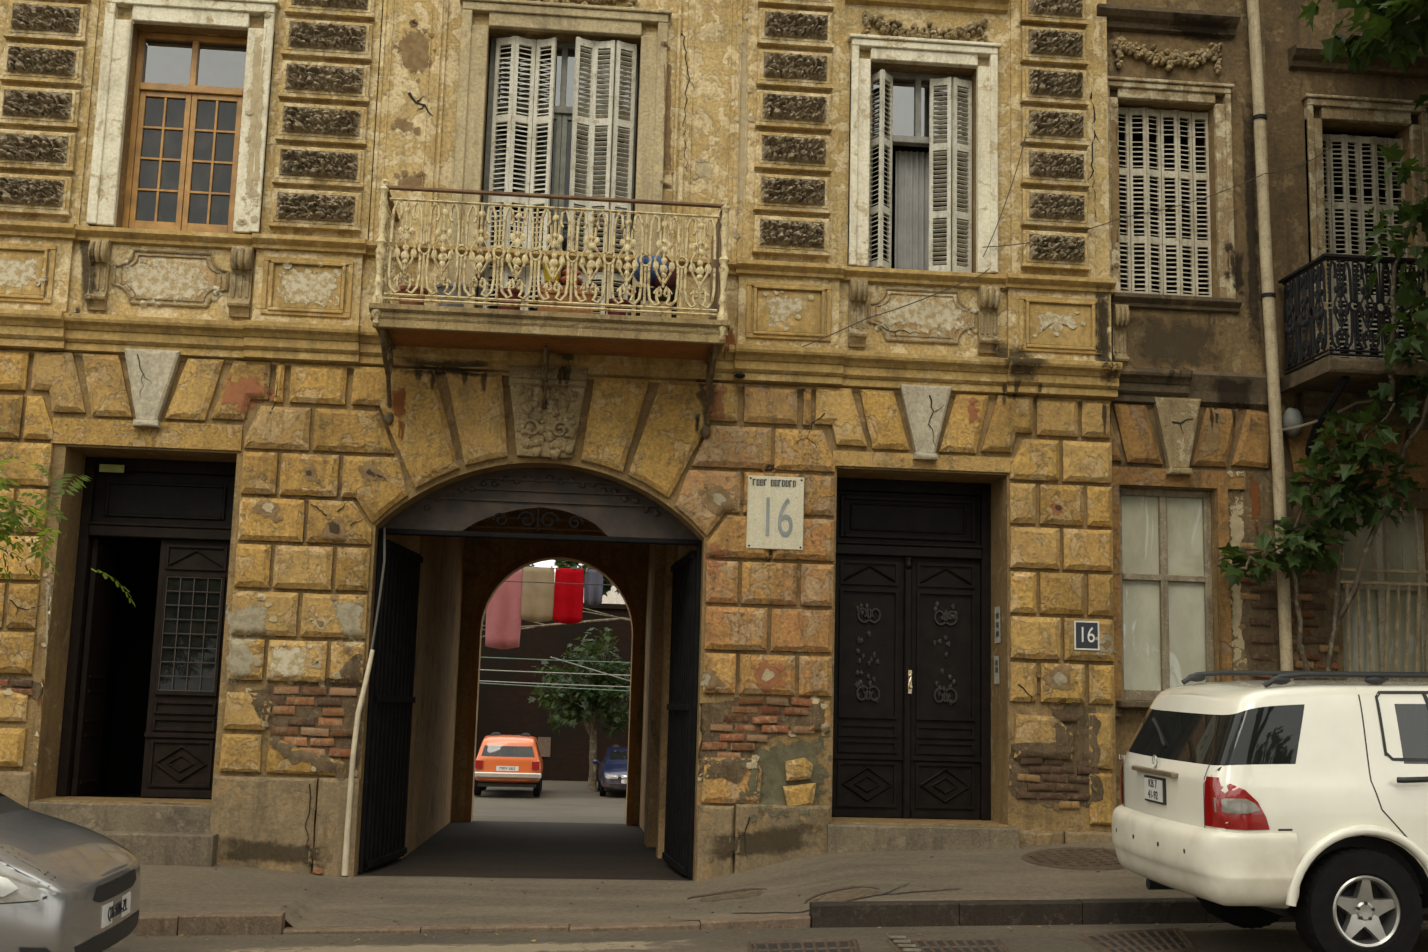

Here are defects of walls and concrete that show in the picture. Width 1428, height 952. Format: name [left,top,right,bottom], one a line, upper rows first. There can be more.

flaking render [221,370,276,413]
crack [928,395,944,446]
flaking render [0,571,54,766]
flaking render [225,593,366,780]
flaking render [698,661,831,822]
flaking render [1008,647,1104,812]